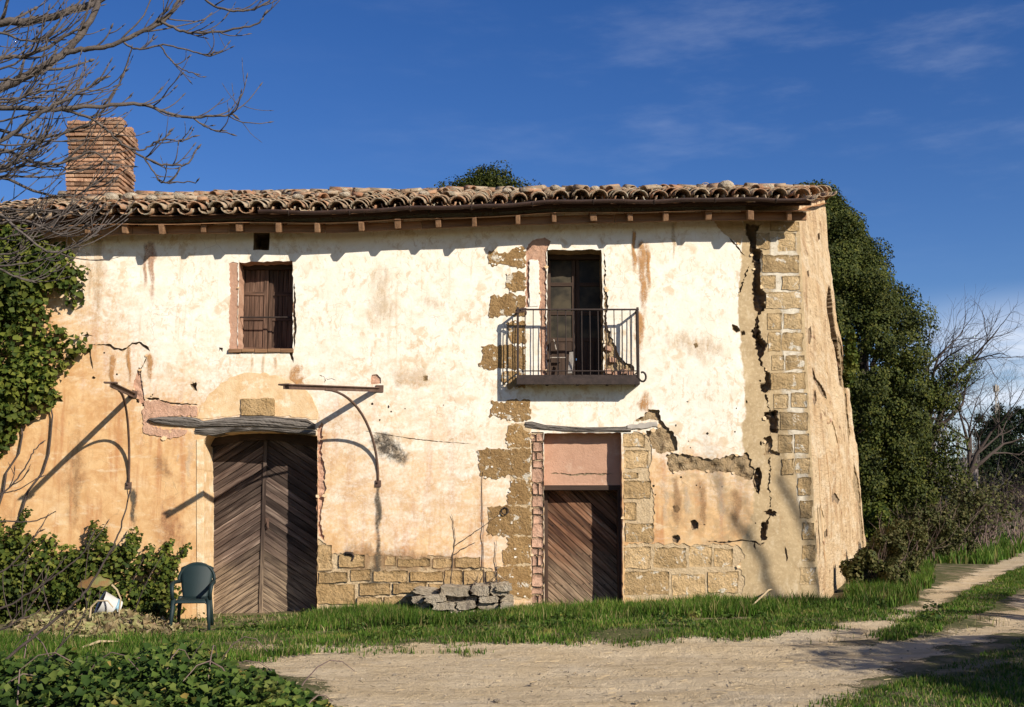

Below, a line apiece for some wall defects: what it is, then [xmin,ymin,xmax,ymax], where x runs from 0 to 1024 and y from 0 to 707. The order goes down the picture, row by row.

crack [82,334,150,371]
peeling [133,368,198,441]
water stain [374,433,406,461]
spalling [316,238,551,609]
spalling [602,254,634,375]
spalling [621,409,780,601]
crack [709,222,788,561]